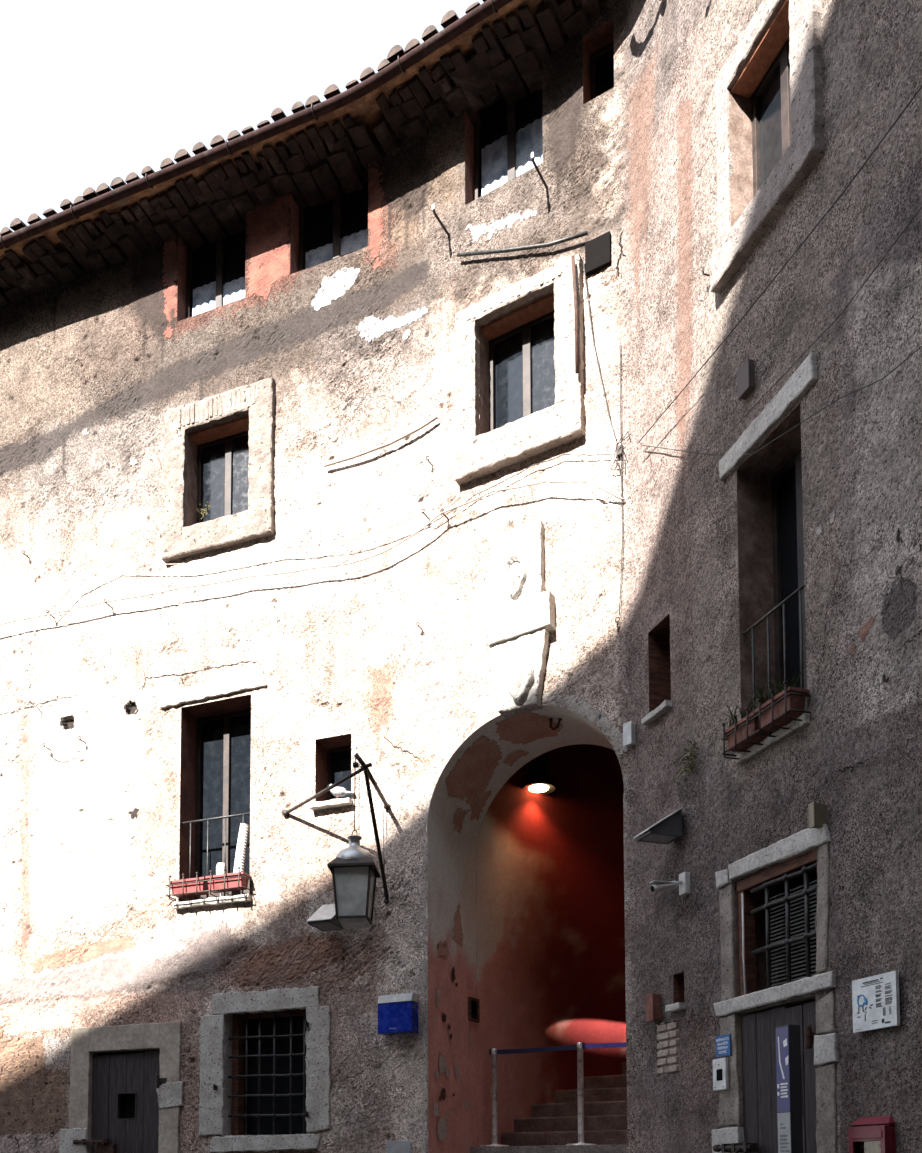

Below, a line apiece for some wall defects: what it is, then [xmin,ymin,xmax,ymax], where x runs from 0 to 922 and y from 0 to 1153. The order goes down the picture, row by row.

flaking render [311,163,385,311]
spalling [465,208,537,243]
peeling [446,690,627,834]
spalling [419,842,463,1153]